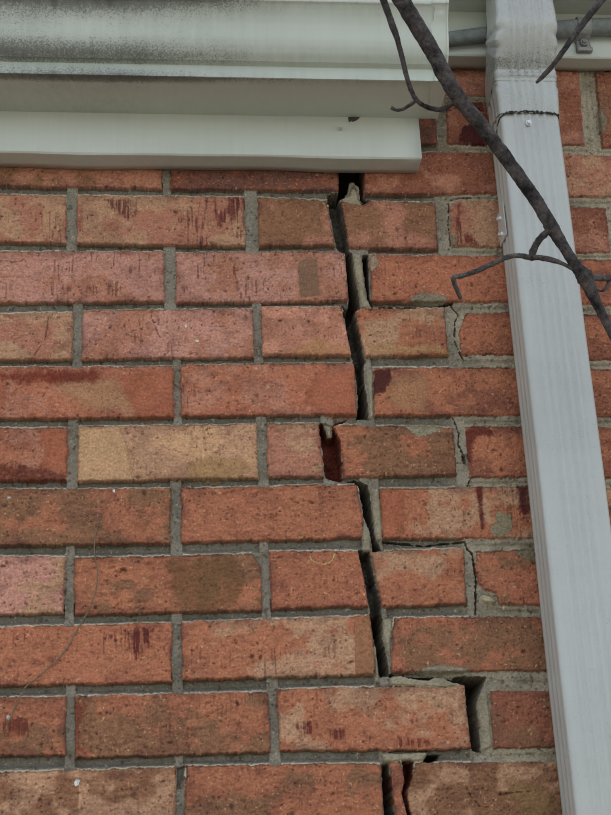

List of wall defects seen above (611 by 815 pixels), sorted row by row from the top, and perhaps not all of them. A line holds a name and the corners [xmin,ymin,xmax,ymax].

crack [319,173,494,753]
crack [381,752,442,815]
crack [465,785,529,808]